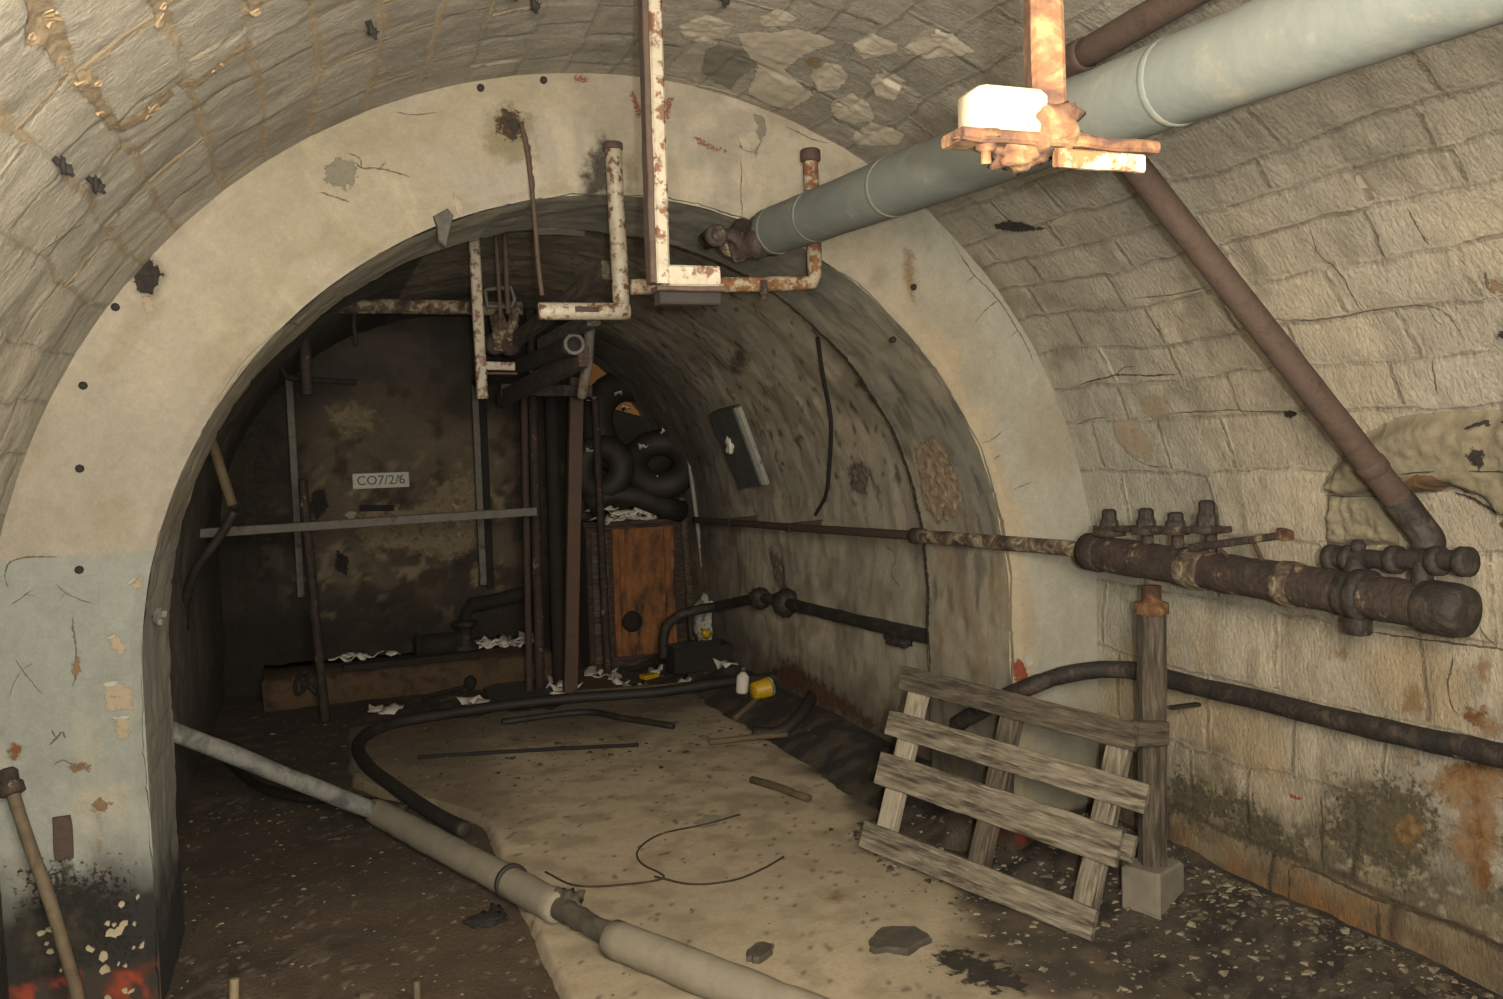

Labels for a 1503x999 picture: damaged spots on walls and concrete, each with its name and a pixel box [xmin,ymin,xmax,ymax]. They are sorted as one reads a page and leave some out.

crack [31,142,122,269]
corrosion [491,107,535,190]
spalling [1483,271,1503,294]
water stain [1167,761,1451,895]
corrosion [1429,762,1503,889]
water stain [0,853,152,999]